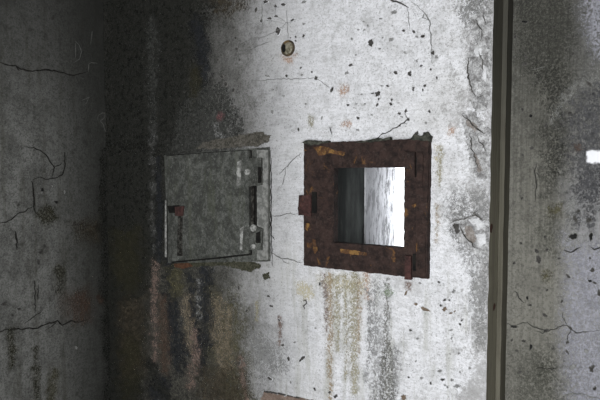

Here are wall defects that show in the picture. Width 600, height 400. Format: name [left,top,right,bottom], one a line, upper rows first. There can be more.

crack [391,0,432,62]
crack [0,62,88,80]
rust [313,146,345,156]
crack [1,147,66,250]
damp [96,0,286,400]
crack [0,280,87,332]
damp [363,279,401,400]
crack [507,313,599,340]